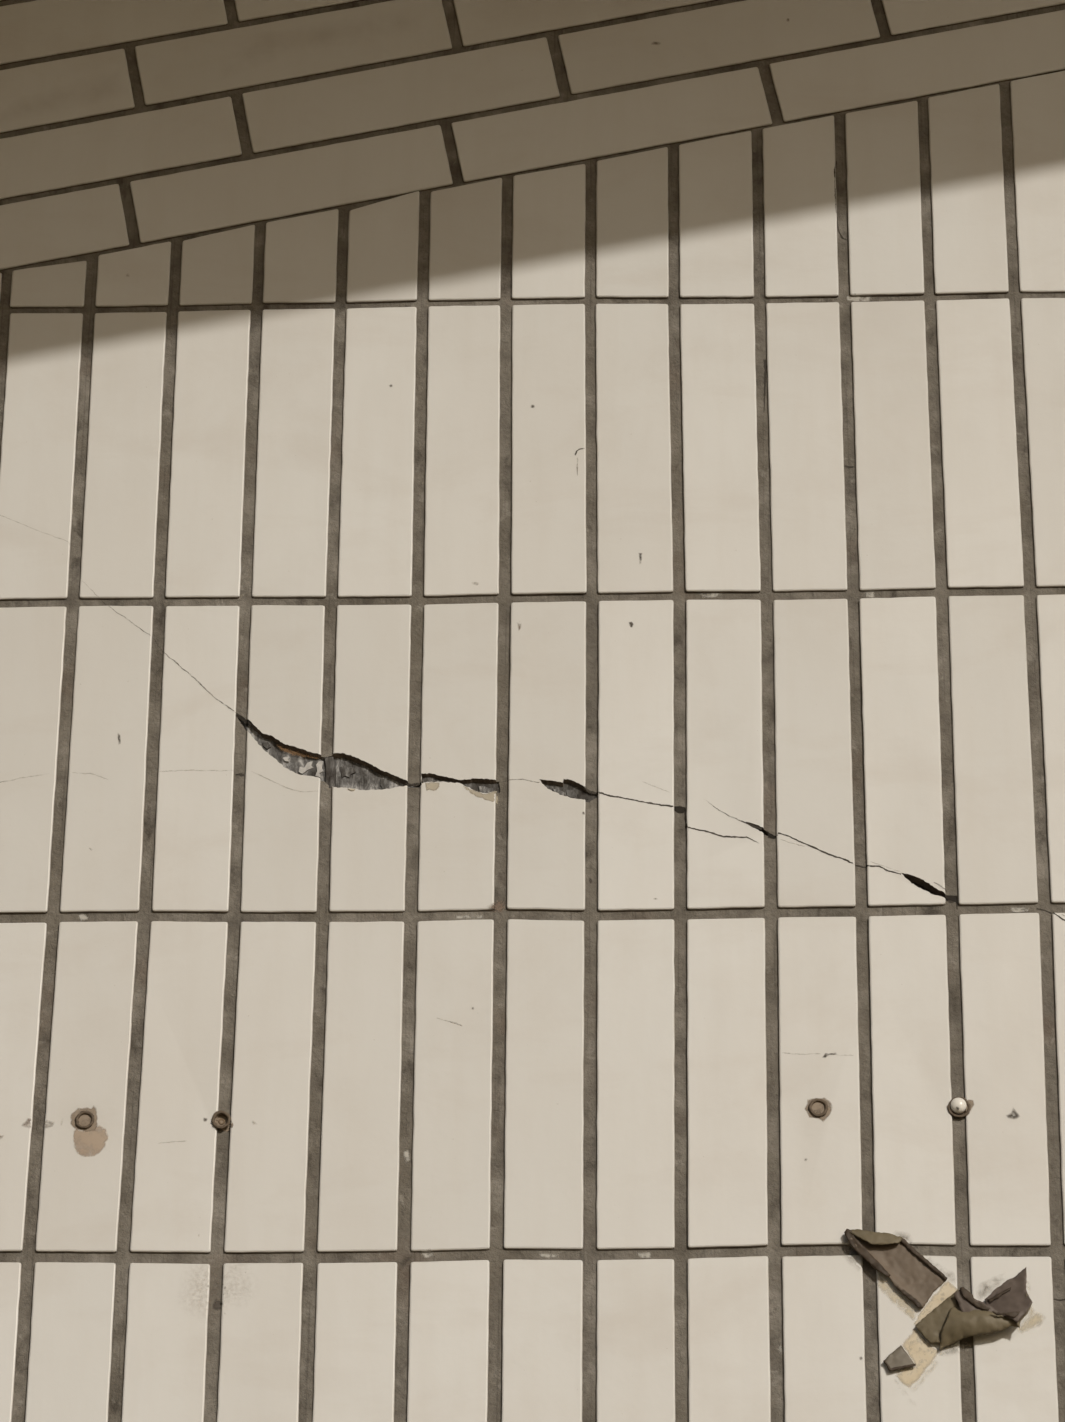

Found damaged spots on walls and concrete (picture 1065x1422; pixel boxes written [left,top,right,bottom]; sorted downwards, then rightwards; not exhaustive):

crack [95,594,251,726]
spalling [238,718,500,803]
spalling [544,783,598,802]
crack [584,787,901,875]
crack [941,886,958,909]